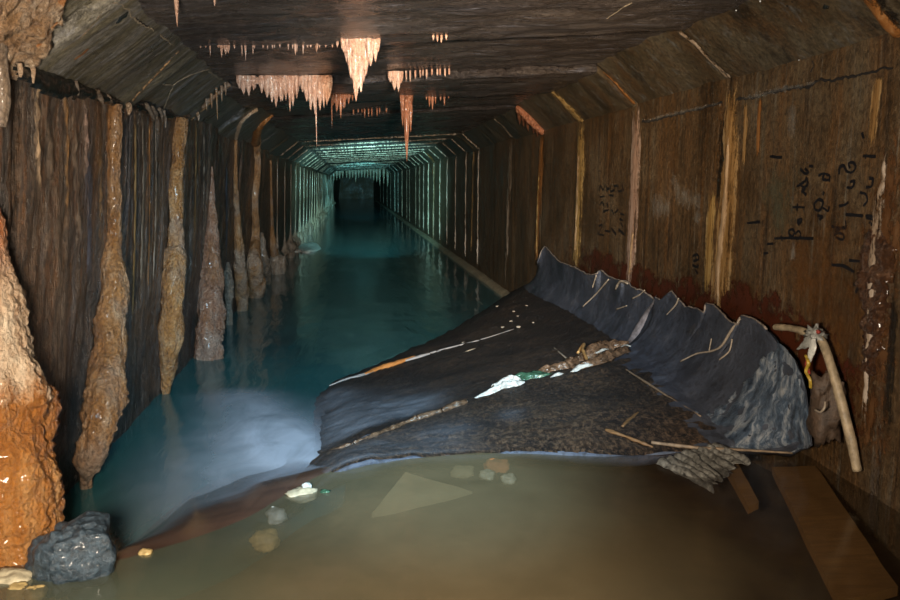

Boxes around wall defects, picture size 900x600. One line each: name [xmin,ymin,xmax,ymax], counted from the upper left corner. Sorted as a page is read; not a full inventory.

crack [641,61,893,123]
damp [132,118,157,311]
rust [568,135,900,459]